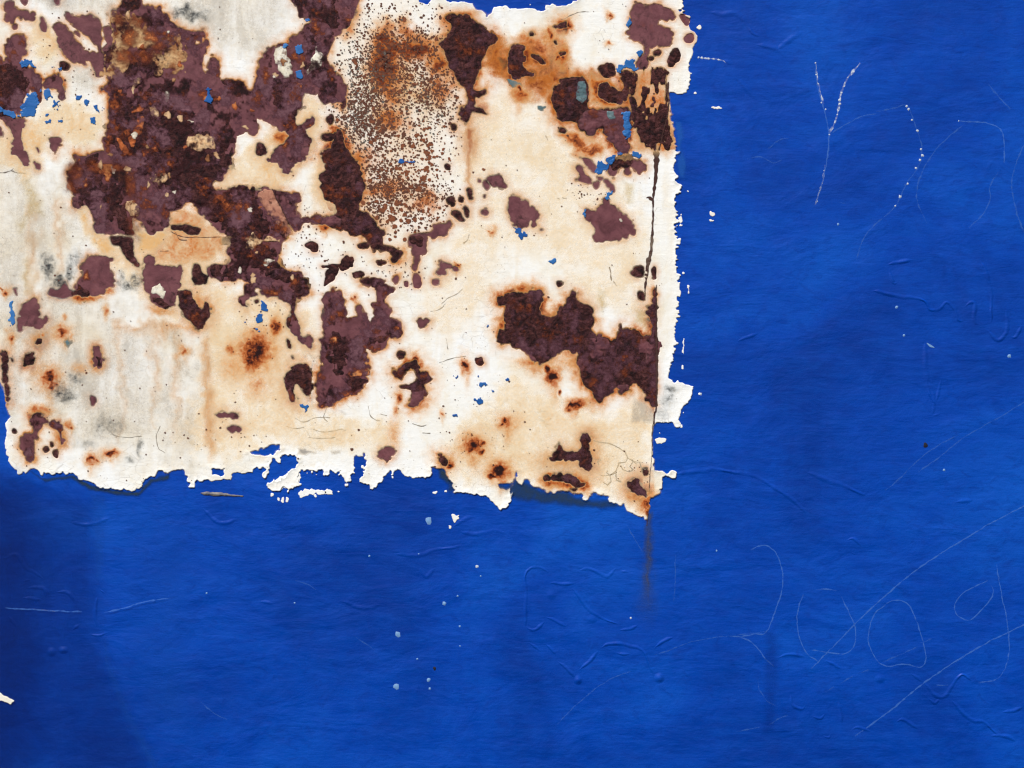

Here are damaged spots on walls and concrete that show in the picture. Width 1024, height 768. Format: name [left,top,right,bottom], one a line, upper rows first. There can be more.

rust [11,405,73,466]
rust [0,0,681,455]
peeling [0,0,719,520]
rust [434,253,662,516]
crack [593,82,670,526]